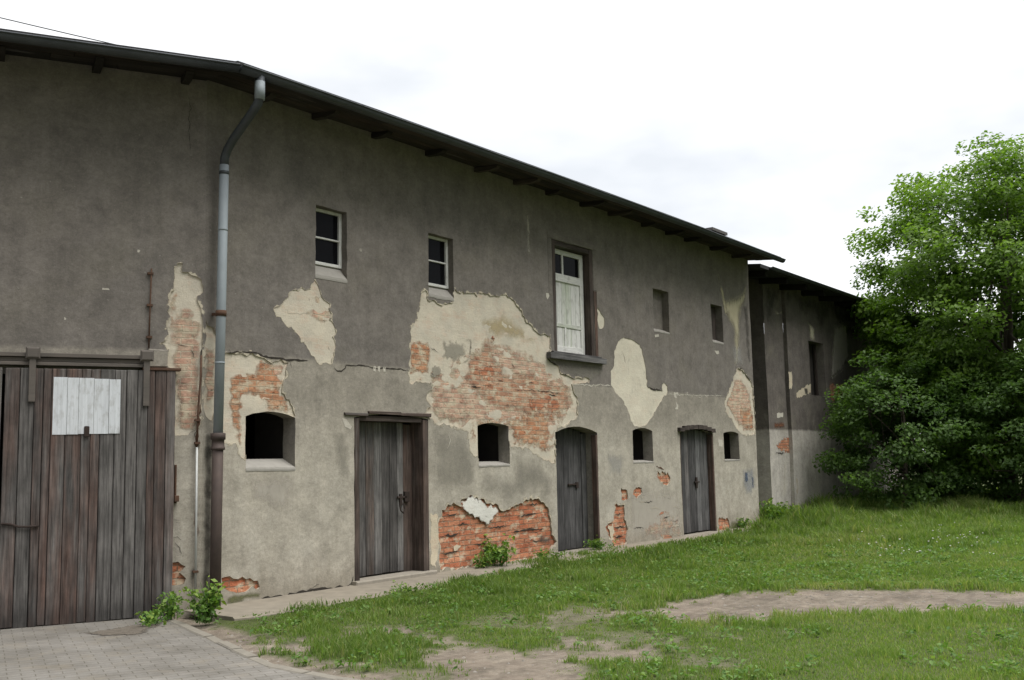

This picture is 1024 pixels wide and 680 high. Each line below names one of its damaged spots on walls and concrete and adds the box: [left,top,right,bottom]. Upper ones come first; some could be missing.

flaking render [273,279,337,365]
flaking render [159,262,295,460]
crack [225,349,308,364]
flaking render [408,287,590,463]
flaking render [611,338,701,427]
flaking render [724,368,756,436]
spalling [656,466,671,486]
spalling [777,438,793,454]
spalling [172,524,186,586]
spalling [222,576,260,593]
spalling [430,495,557,572]
spalling [606,487,642,546]